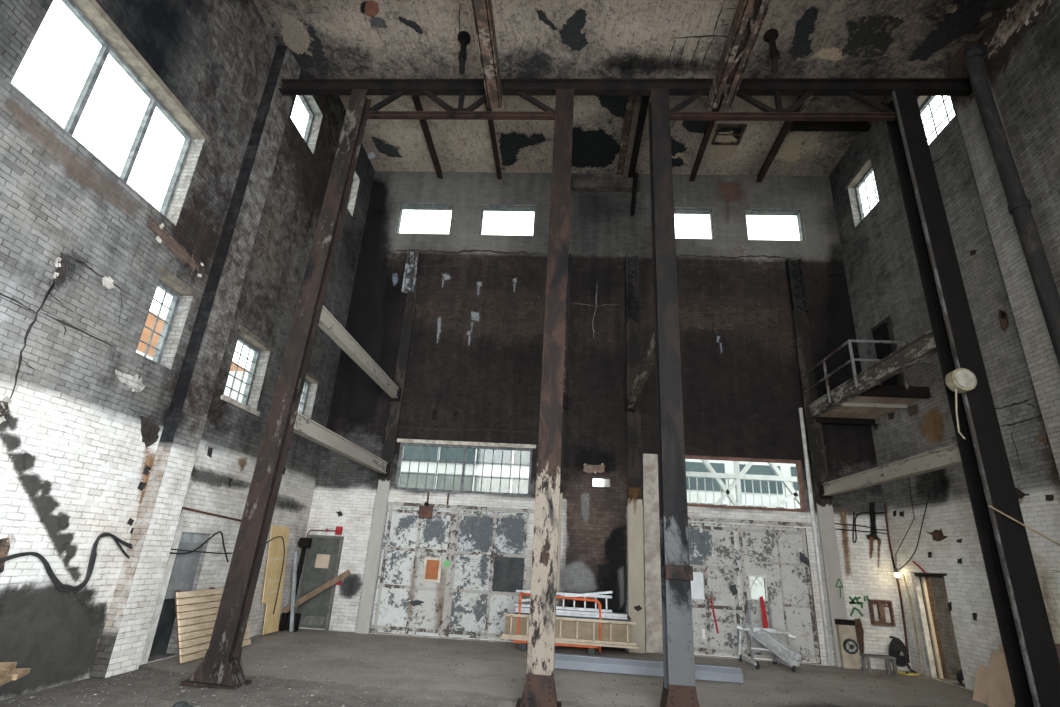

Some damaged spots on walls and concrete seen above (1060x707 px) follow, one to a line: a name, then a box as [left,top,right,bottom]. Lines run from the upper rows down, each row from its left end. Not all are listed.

spalling [534,4,588,51]
spalling [907,0,1051,62]
spalling [596,96,628,119]
spalling [496,131,553,170]
spalling [572,124,620,170]
crack [0,256,131,399]
spalling [0,396,13,424]
peeling [394,512,446,547]
peeling [469,512,527,591]
peeling [688,522,715,561]